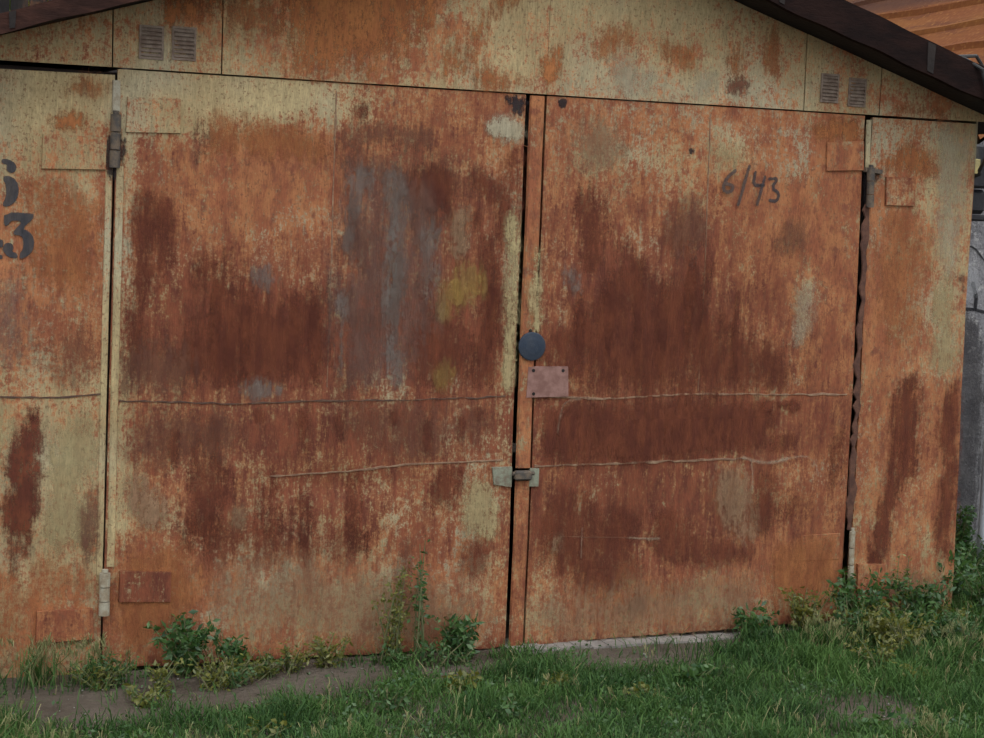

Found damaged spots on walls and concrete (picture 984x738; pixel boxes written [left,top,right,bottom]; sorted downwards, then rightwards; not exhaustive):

rust [47,110,87,131]
rust [444,0,527,115]
rust [726,47,749,95]
rust [125,191,175,385]
rust [469,148,522,387]
rust [0,407,44,577]
rust [81,484,100,560]
rust [182,417,234,549]
rust [290,489,311,547]
rust [430,468,463,507]
rust [867,374,921,564]
rust [934,383,961,557]